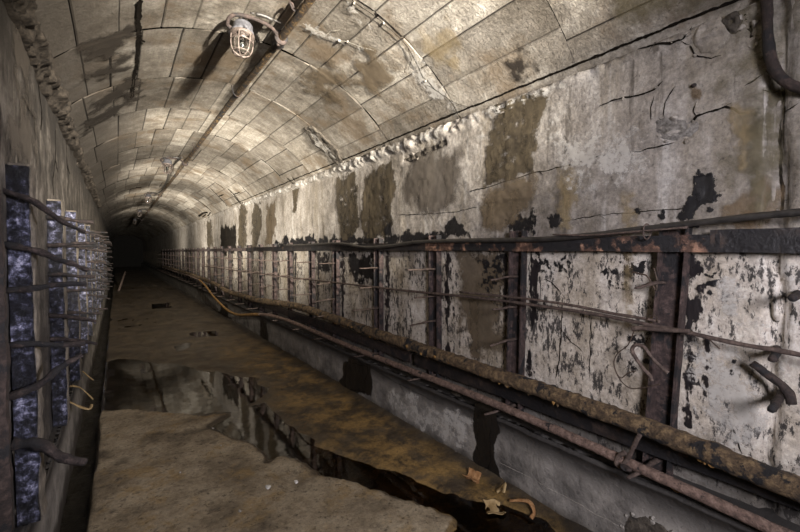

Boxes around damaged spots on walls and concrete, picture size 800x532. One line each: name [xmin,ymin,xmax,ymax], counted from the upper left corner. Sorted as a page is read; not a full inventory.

crack [130,0,145,98]
spalling [2,0,102,208]
crack [198,0,749,219]
leakage [207,81,652,332]
leakage [677,169,722,228]
leakage [339,358,373,396]
leakage [526,341,535,378]
leakage [627,331,652,373]
leakage [388,389,500,477]